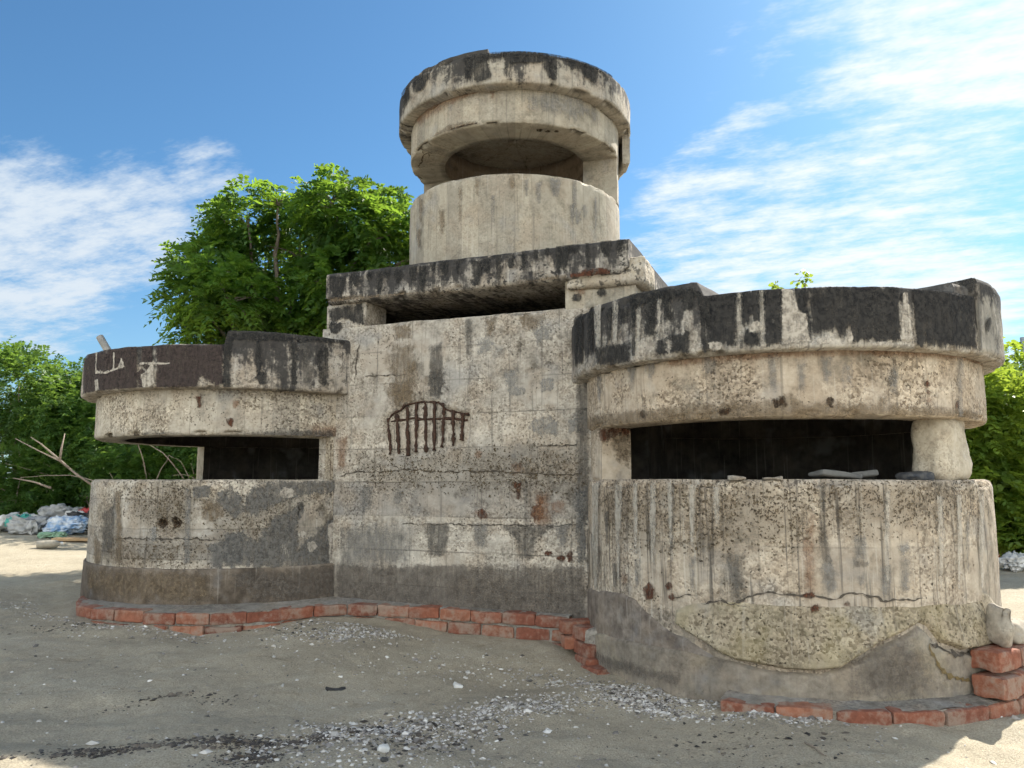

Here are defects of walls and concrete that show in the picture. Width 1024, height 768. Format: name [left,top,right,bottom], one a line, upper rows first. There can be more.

water stain [401,71,429,107]
water stain [464,51,612,84]
water stain [223,239,623,387]
water stain [959,278,992,349]
water stain [232,288,978,618]
water stain [88,490,223,602]
corrosion [642,582,675,601]
flaking render [587,588,988,703]
crack [675,591,924,607]
water stain [957,495,984,588]